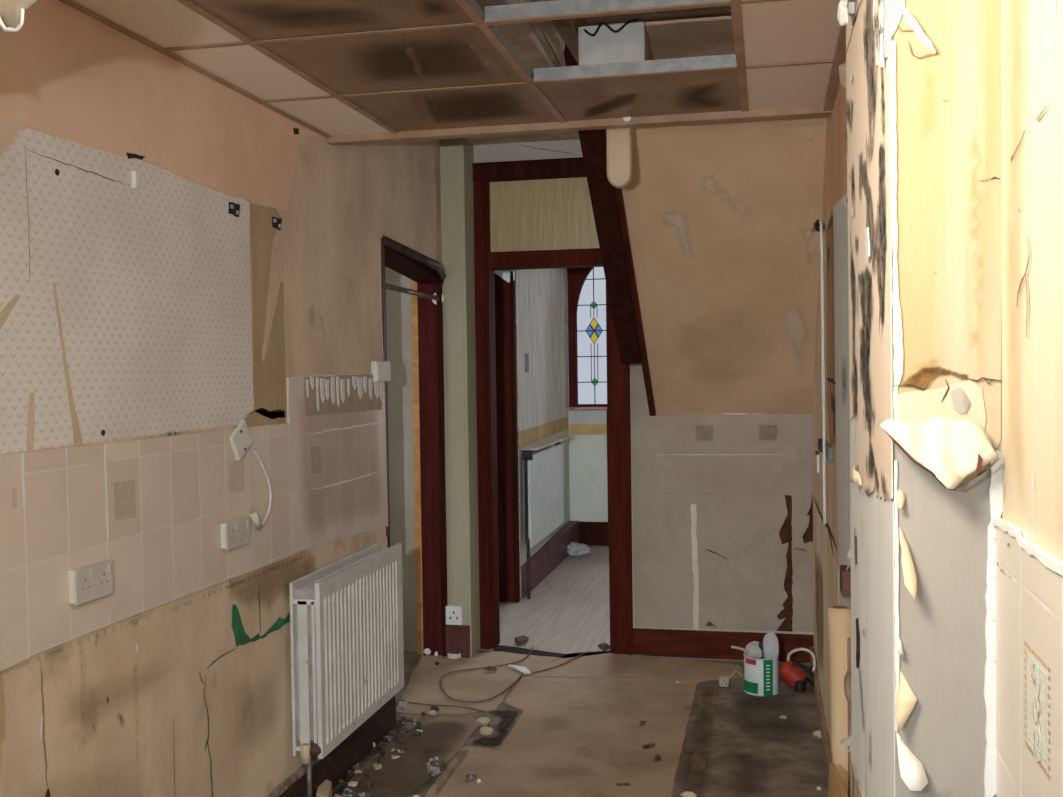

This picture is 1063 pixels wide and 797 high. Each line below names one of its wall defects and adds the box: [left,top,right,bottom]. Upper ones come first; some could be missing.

spalling [873,0,936,67]
crack [896,24,936,59]
peeling [228,202,287,427]
water stain [849,0,886,496]
crack [1016,238,1030,338]
spalling [898,380,986,430]
spalling [777,493,813,632]
crack [813,496,837,554]